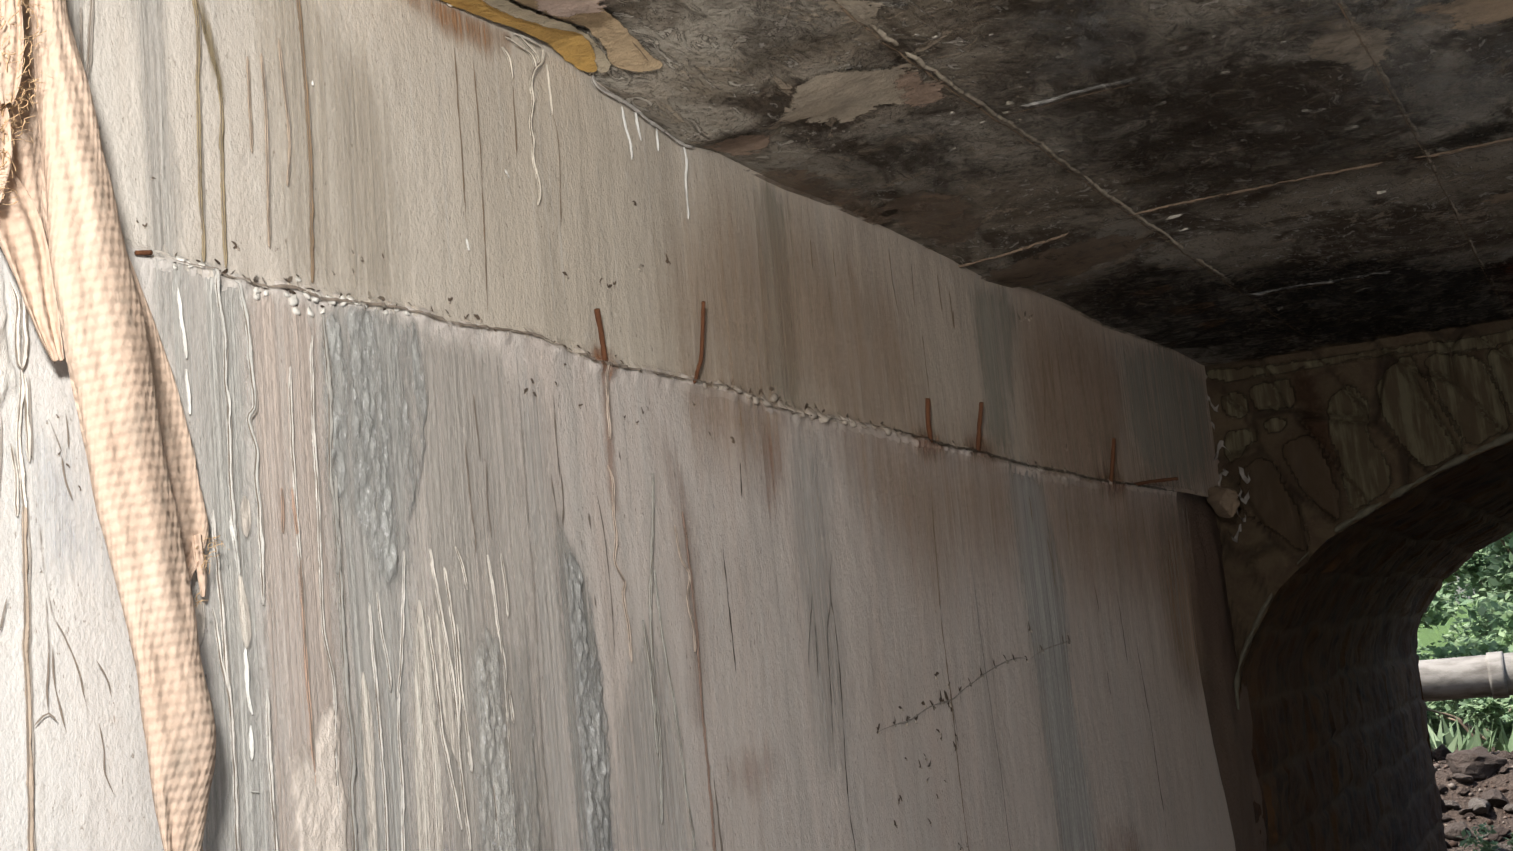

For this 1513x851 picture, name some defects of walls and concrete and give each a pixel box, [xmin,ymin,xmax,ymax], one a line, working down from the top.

peeling [1307,0,1513,71]
leakage [454,48,488,312]
peeling [703,63,955,224]
leakage [138,0,270,851]
rust [594,308,611,376]
rust [693,301,705,384]
rust [925,398,933,443]
rust [970,402,988,452]
leakage [332,302,613,851]
crack [138,246,1176,851]
leakage [1009,465,1094,851]